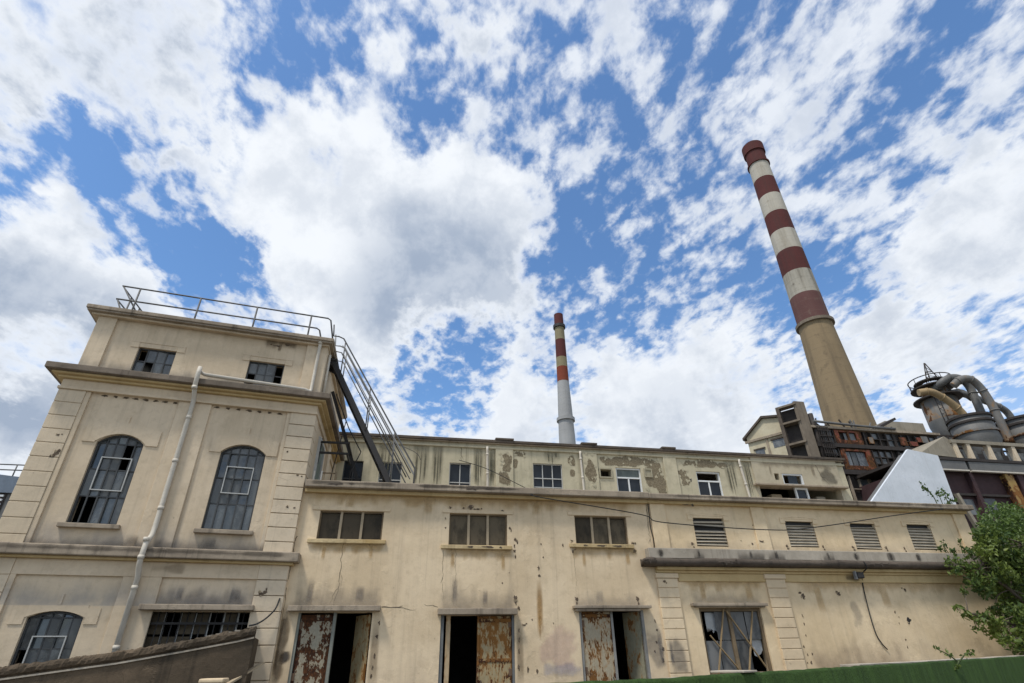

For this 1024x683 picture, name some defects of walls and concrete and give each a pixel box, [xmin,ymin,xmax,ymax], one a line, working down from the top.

damp [415,457,449,487]
peeling [466,450,525,490]
peeling [568,453,668,494]
peeling [678,459,727,486]